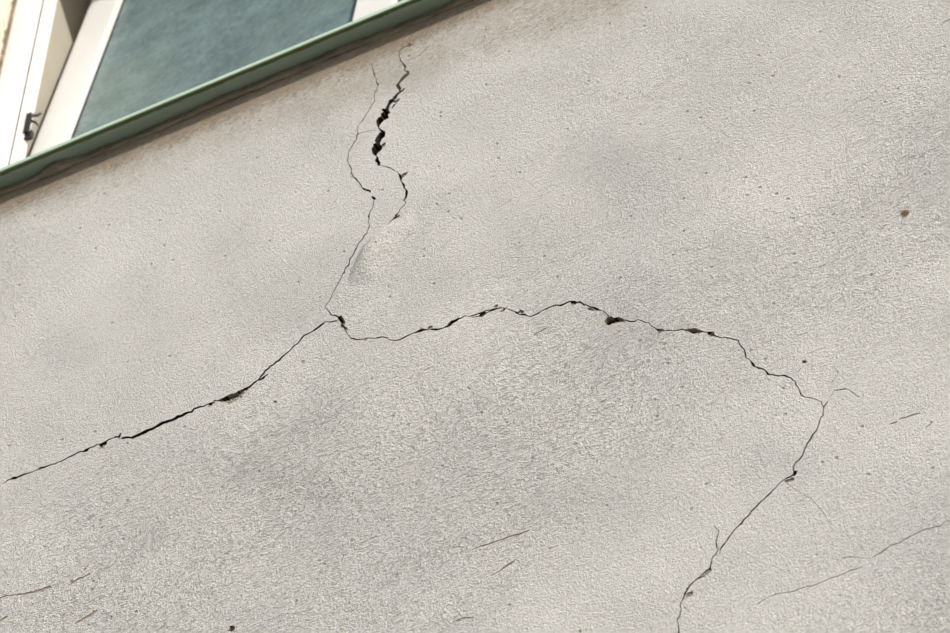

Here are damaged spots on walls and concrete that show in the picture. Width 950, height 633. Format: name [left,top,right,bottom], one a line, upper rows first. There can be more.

crack [2,38,687,484]
crack [677,331,859,633]